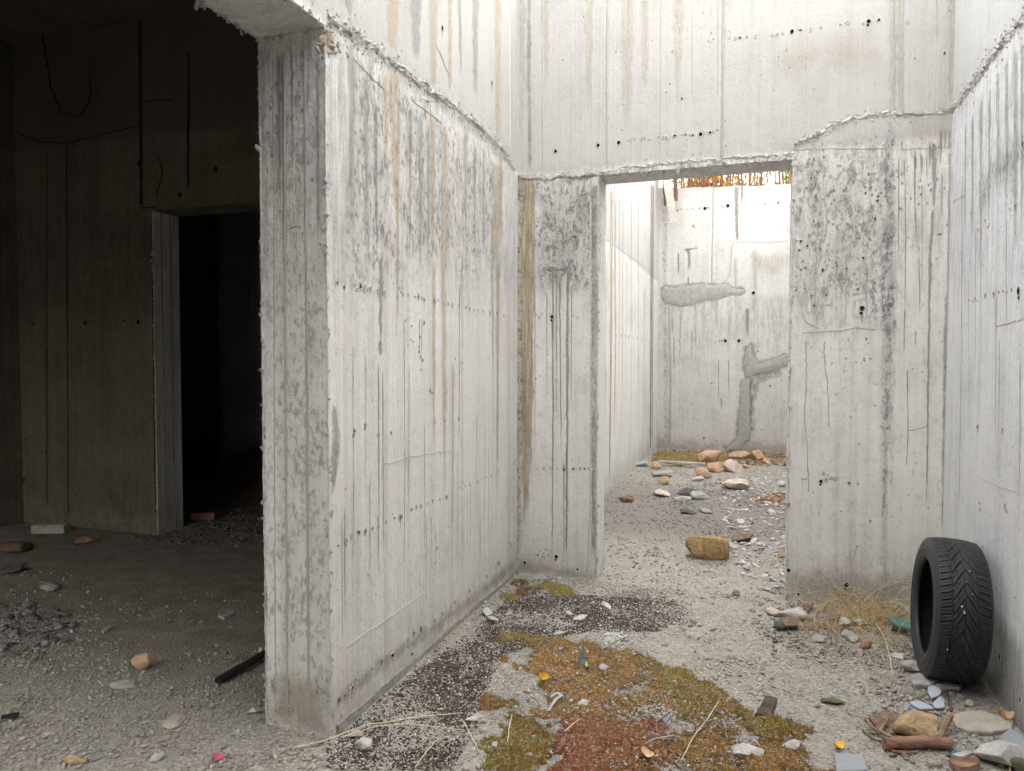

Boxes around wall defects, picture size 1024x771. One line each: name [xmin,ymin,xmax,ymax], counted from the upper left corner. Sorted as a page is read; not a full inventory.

damp [277,60,293,225]
damp [304,56,377,277]
damp [365,368,384,546]